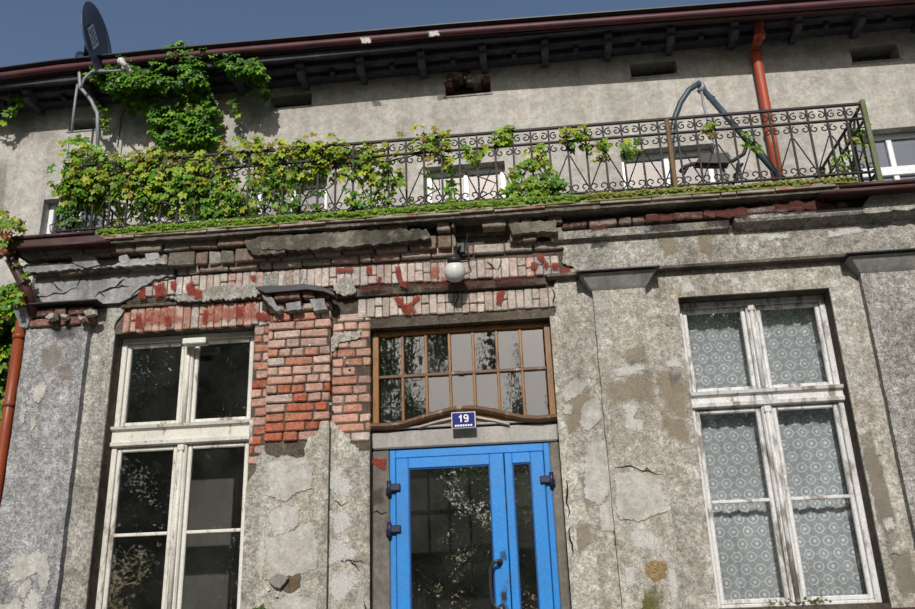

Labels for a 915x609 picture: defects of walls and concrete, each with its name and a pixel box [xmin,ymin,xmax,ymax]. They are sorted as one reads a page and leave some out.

spalling [444,71,491,94]
crack [35,269,176,298]
spalling [121,241,571,609]
crack [616,465,661,475]
peeling [561,379,678,605]
peeling [883,517,897,531]
peeling [0,548,52,609]